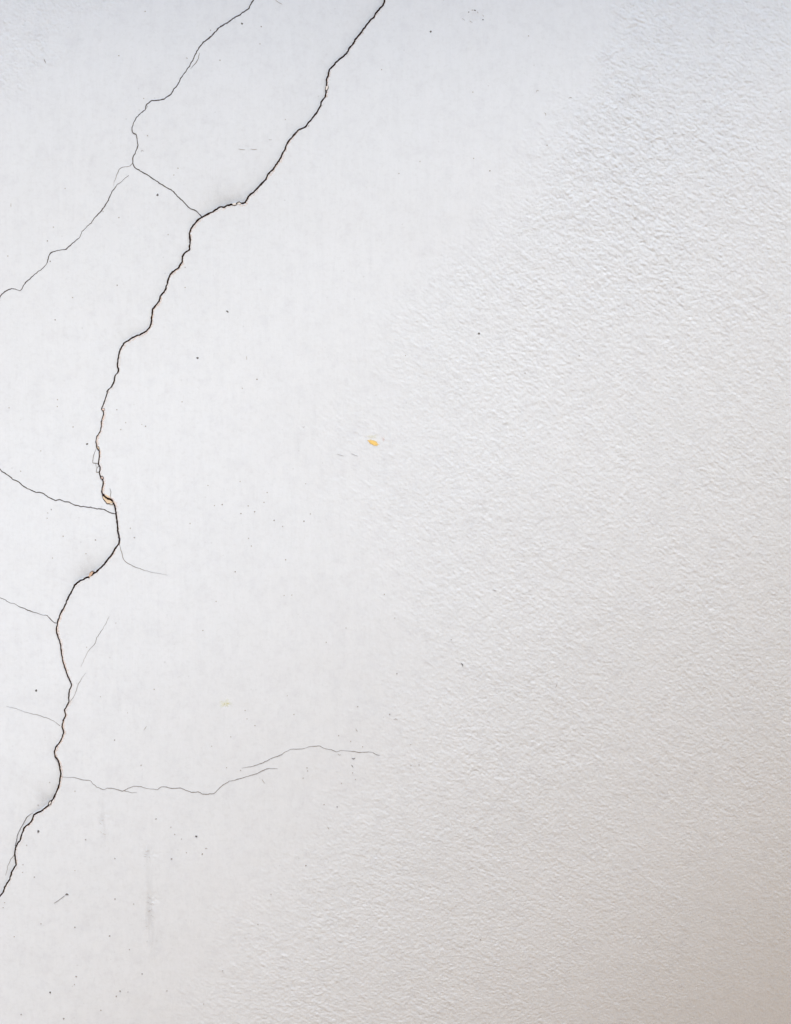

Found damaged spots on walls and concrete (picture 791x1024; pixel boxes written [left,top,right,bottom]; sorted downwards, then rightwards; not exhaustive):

crack [0,0,385,896]